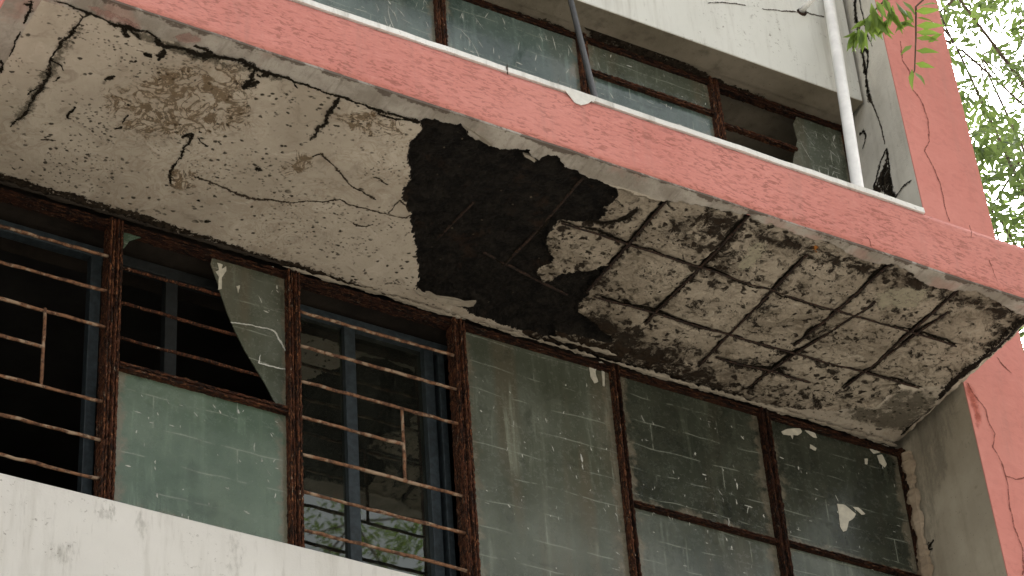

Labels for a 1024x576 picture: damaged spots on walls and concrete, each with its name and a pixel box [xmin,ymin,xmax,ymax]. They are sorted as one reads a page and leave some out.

crack [0,1,420,227]
crack [853,0,911,198]
crack [900,41,972,236]
spalling [401,118,1024,412]
crack [968,384,1024,575]